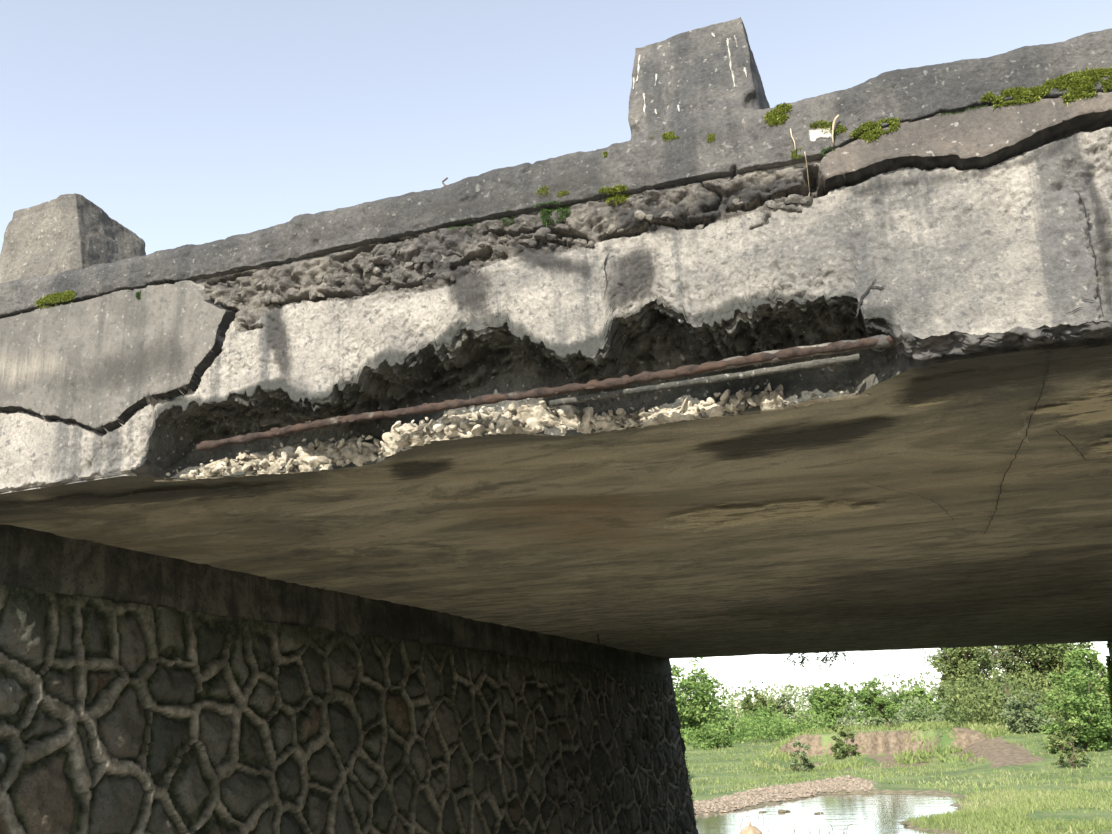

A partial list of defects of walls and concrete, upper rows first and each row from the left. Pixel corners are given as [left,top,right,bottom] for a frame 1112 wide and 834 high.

crack [823,91,1112,196]
crack [0,295,96,319]
crack [127,280,175,292]
spalling [0,92,1112,482]
crack [0,300,237,434]
leakage [897,345,1112,408]
leakage [694,419,894,461]
crack [984,351,1111,534]